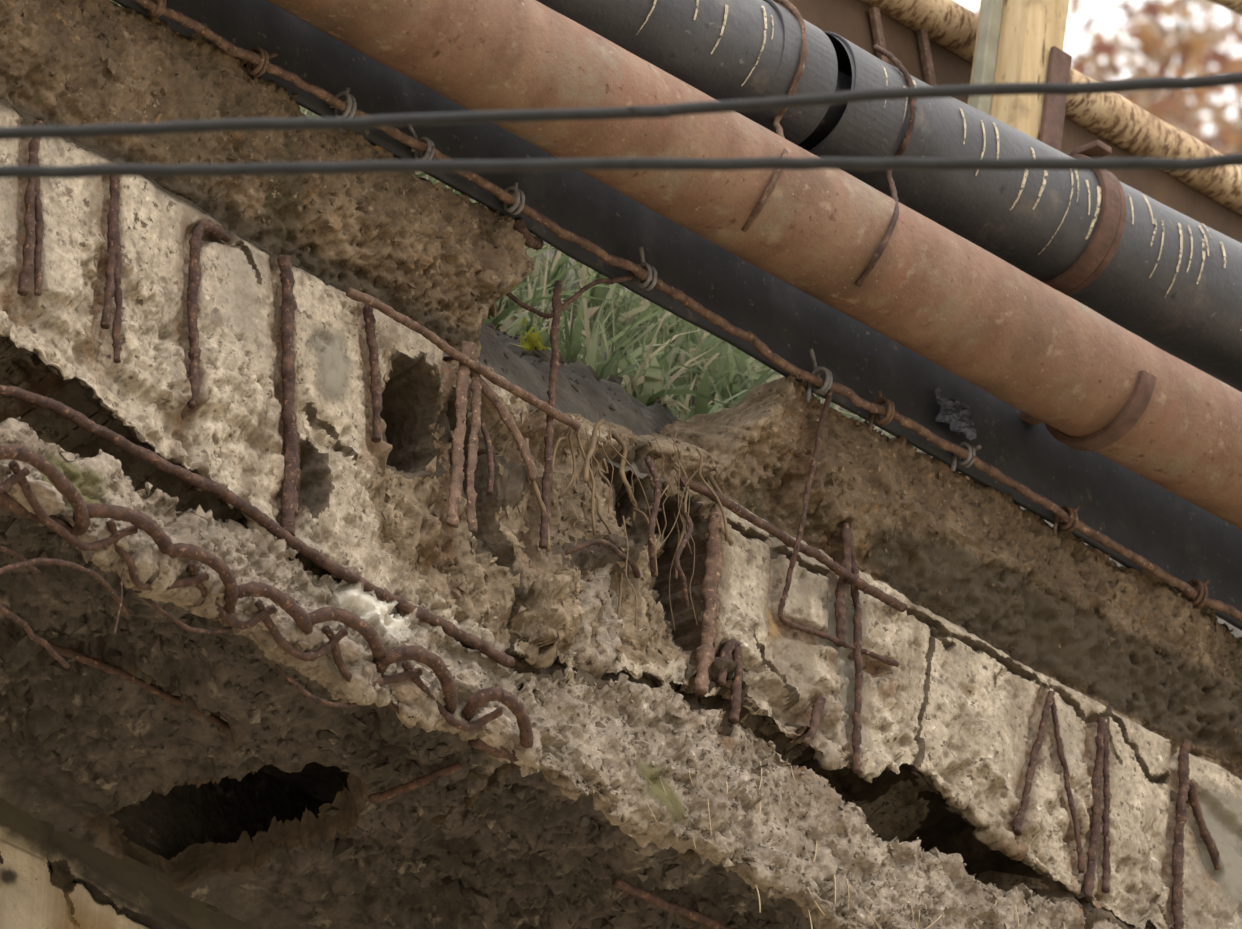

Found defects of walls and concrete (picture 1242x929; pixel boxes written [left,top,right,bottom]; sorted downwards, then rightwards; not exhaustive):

spalling [28,120,43,165]
spalling [134,0,452,160]
spalling [0,172,1242,904]
crack [726,518,1190,808]